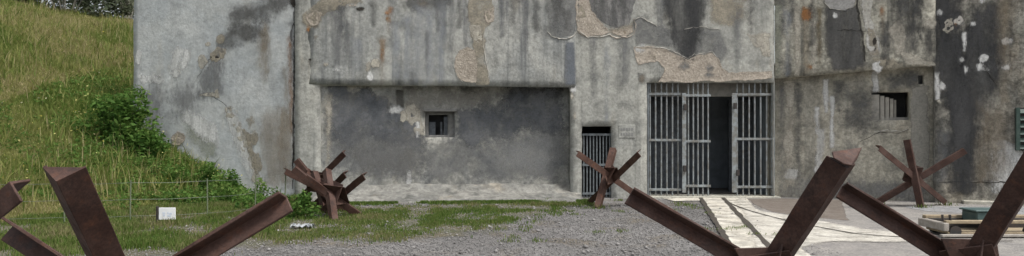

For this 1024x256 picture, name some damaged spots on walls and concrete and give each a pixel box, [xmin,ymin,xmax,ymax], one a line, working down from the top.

water stain [217,0,290,48]
spalling [453,0,495,85]
water stain [658,0,706,60]
peeling [824,0,935,72]
spalling [923,16,967,51]
peeling [324,59,425,158]
spalling [546,0,801,176]
water stain [774,0,1010,194]